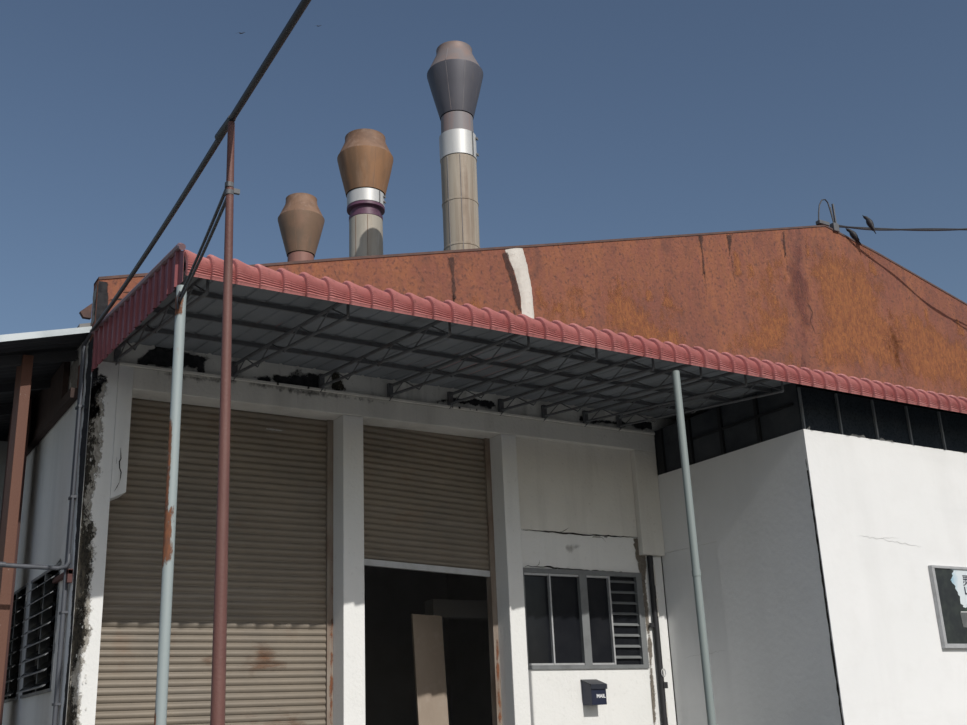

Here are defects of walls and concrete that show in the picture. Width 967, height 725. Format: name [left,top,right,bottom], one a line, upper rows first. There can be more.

peeling [66,358,108,725]
rust [162,419,174,567]